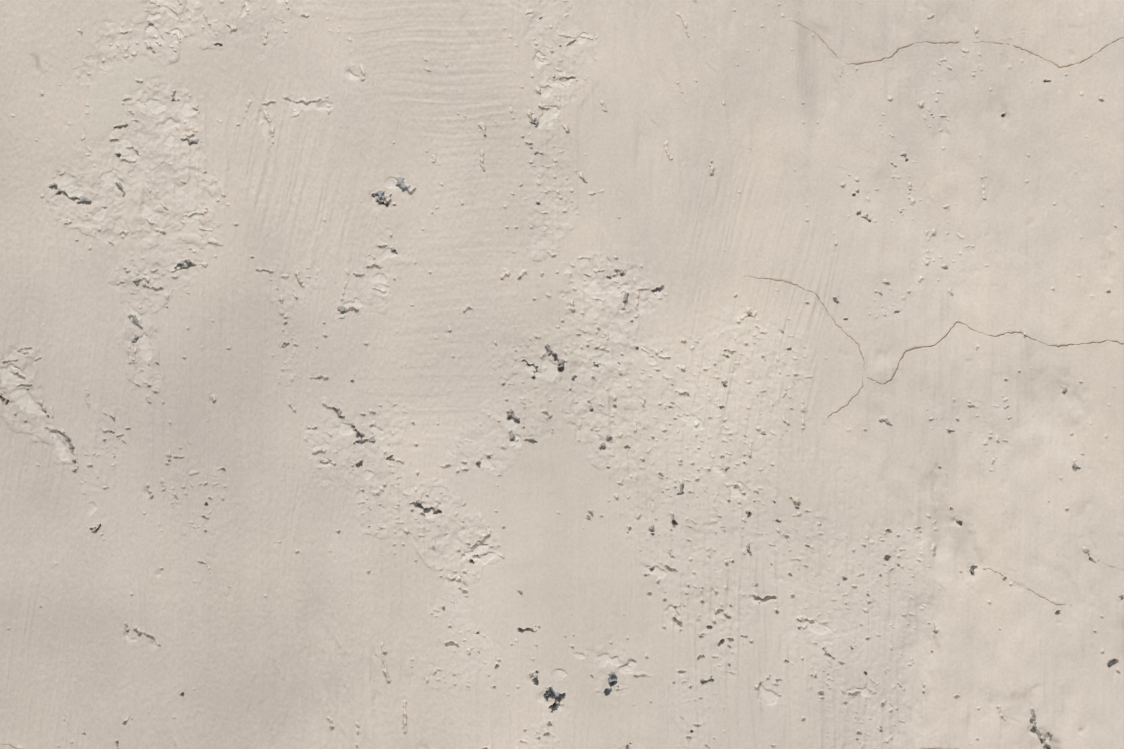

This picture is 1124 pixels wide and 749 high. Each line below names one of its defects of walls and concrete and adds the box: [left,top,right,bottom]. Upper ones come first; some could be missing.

crack [789,18,1124,76]
flaking render [41,0,229,391]
peeling [372,177,416,202]
flaking render [331,228,413,322]
flaking render [445,0,663,492]
crack [745,273,1124,424]
flaking render [0,344,131,496]
flaking render [303,396,503,589]
crack [982,565,1070,608]
flaking render [513,670,568,749]
peeling [574,653,634,696]
crack [914,741,960,749]